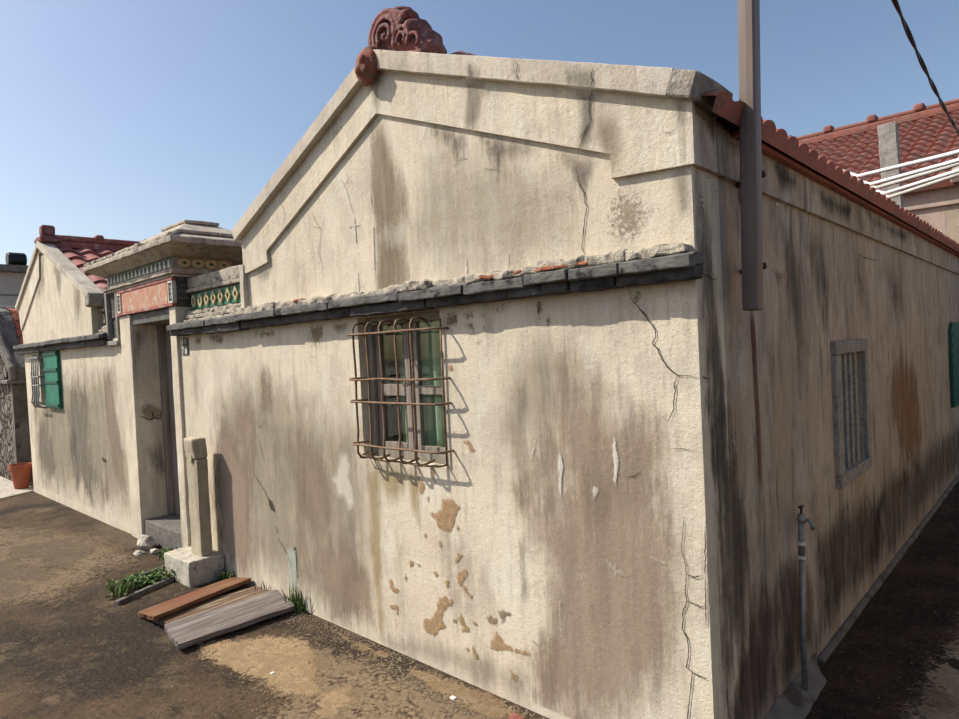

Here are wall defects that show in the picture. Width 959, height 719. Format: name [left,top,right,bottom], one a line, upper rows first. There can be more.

leakage [372,135,405,229]
crack [576,69,593,254]
leakage [378,244,405,290]
crack [628,290,709,421]
leakage [35,380,125,503]
leakage [218,378,416,612]
flaking render [332,455,354,510]
peeling [417,468,460,547]
leakage [520,369,673,707]
leakage [697,234,817,719]
peeling [423,553,531,656]
crack [681,520,708,719]